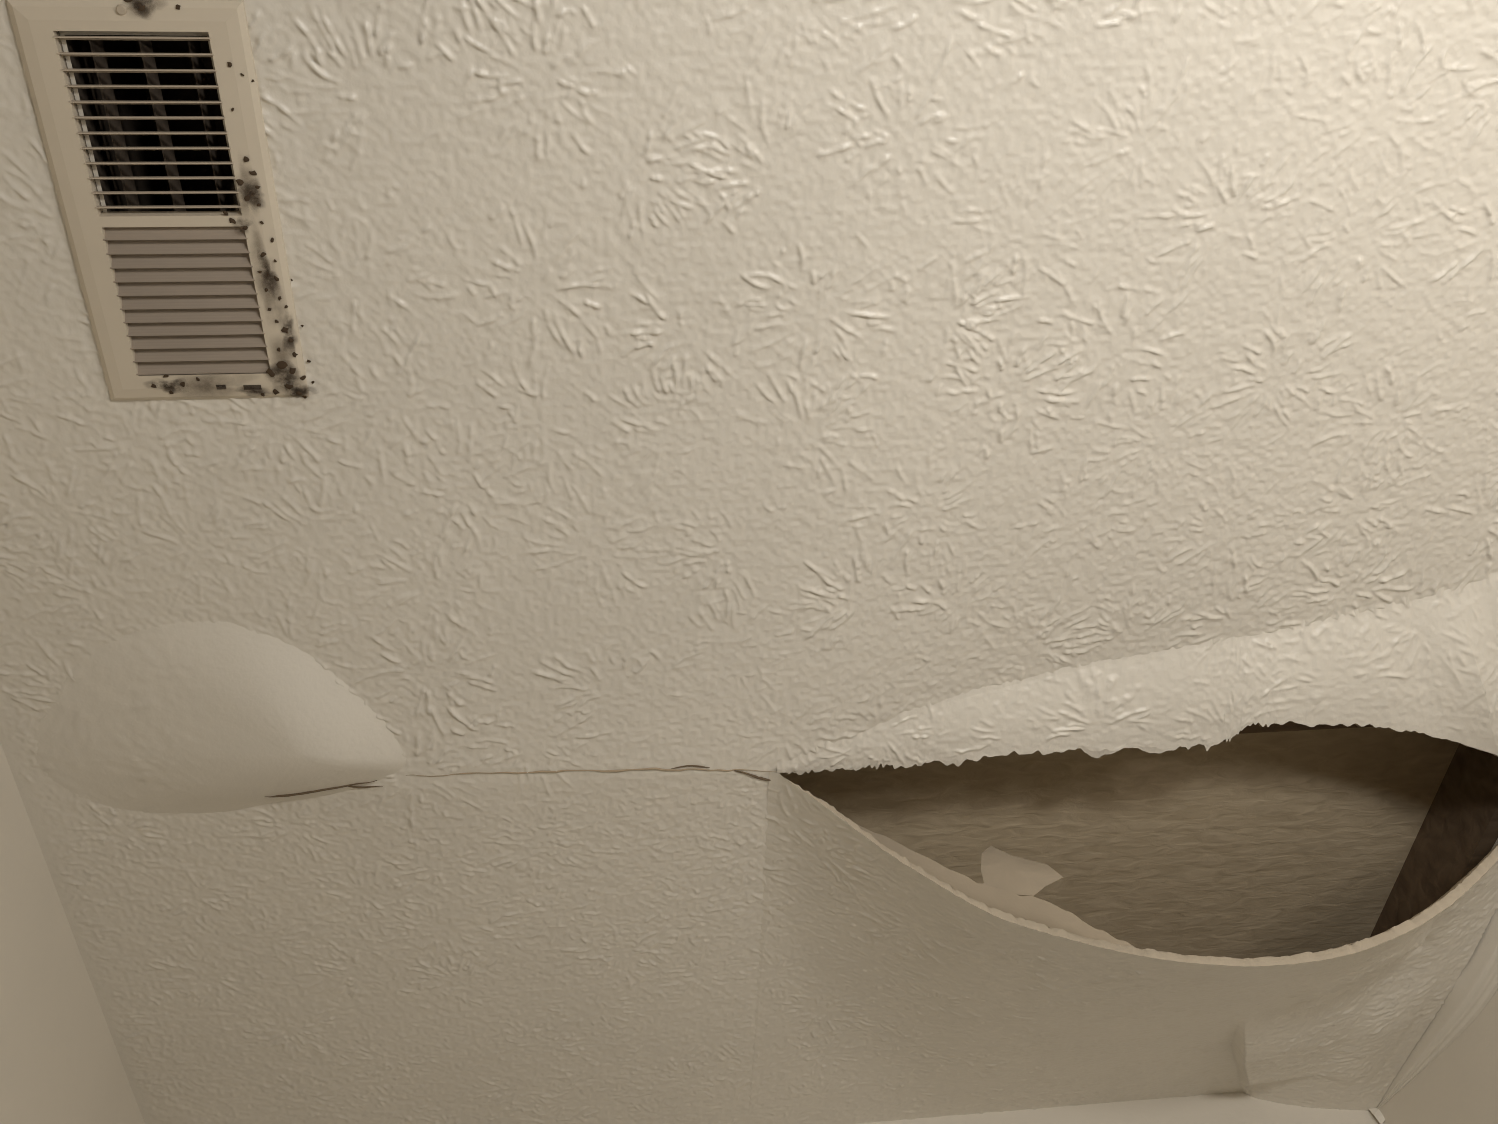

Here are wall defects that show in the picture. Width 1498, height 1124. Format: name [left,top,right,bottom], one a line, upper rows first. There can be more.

leakage [124,0,149,15]
leakage [223,156,314,399]
leakage [151,374,213,394]
crack [265,765,775,797]